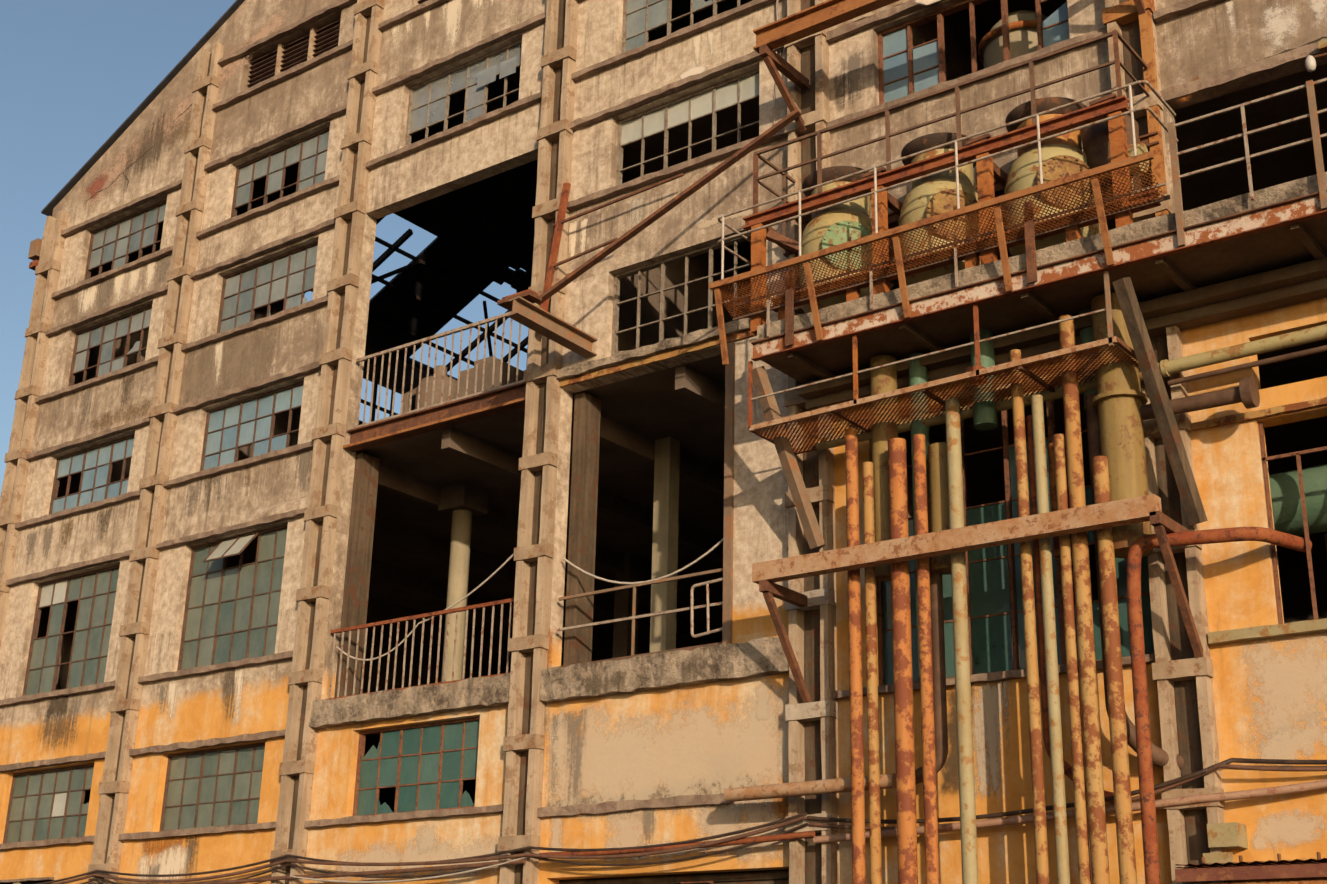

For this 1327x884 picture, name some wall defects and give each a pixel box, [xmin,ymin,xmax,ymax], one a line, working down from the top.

leakage [43,695,81,748]
leakage [158,681,178,718]
leakage [223,667,244,722]
peeling [1246,632,1327,766]